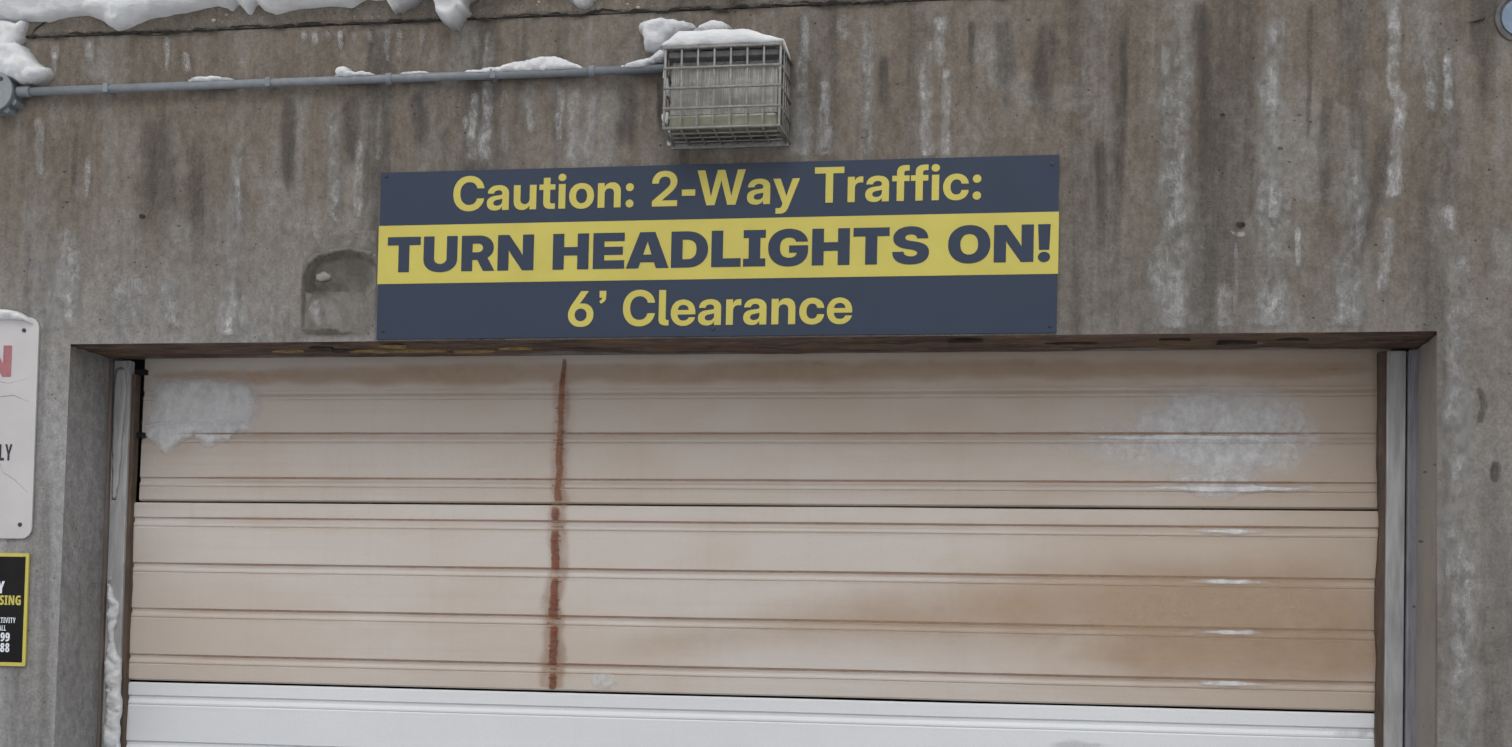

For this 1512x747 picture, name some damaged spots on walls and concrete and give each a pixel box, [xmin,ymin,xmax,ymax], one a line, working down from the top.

damp [329,125,362,216]
damp [469,112,490,155]
damp [797,17,830,154]
damp [935,18,948,78]
damp [1152,55,1191,325]
damp [1260,67,1280,162]
damp [1259,180,1300,263]
damp [1389,68,1404,127]
damp [1429,56,1452,108]
damp [1444,208,1454,229]
damp [221,216,244,335]
corrosion [185,360,1310,689]